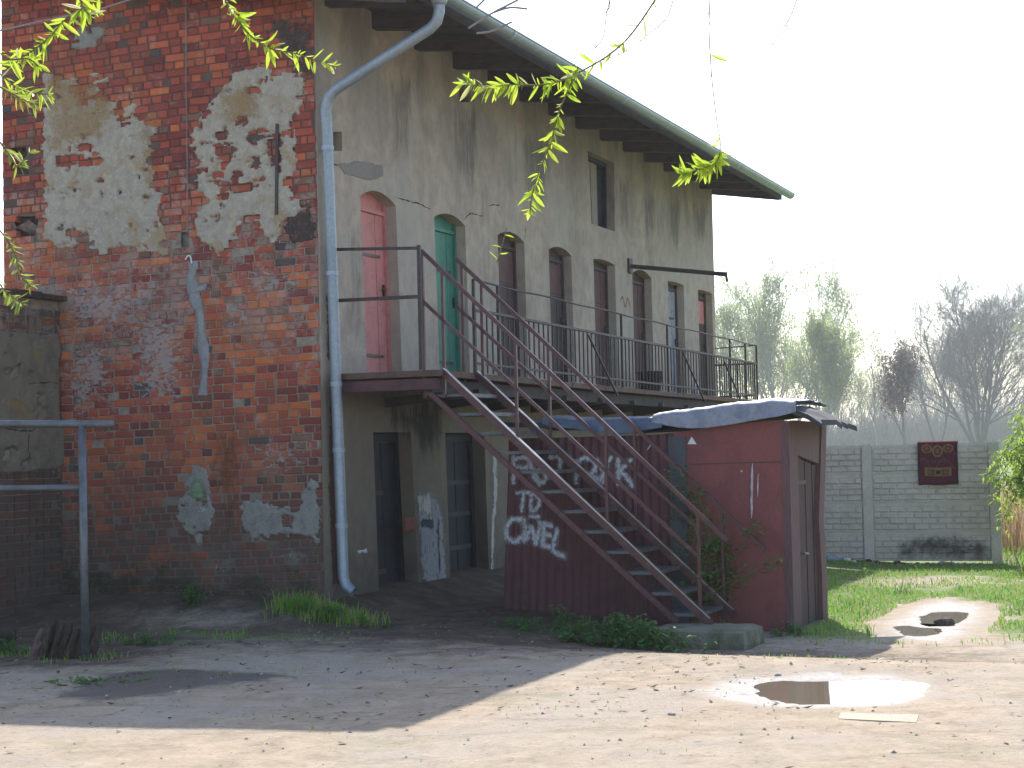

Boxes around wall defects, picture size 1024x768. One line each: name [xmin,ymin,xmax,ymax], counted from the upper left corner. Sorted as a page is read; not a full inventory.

flaking render [40,73,169,258]
flaking render [187,63,316,256]
peeling [403,490,447,581]